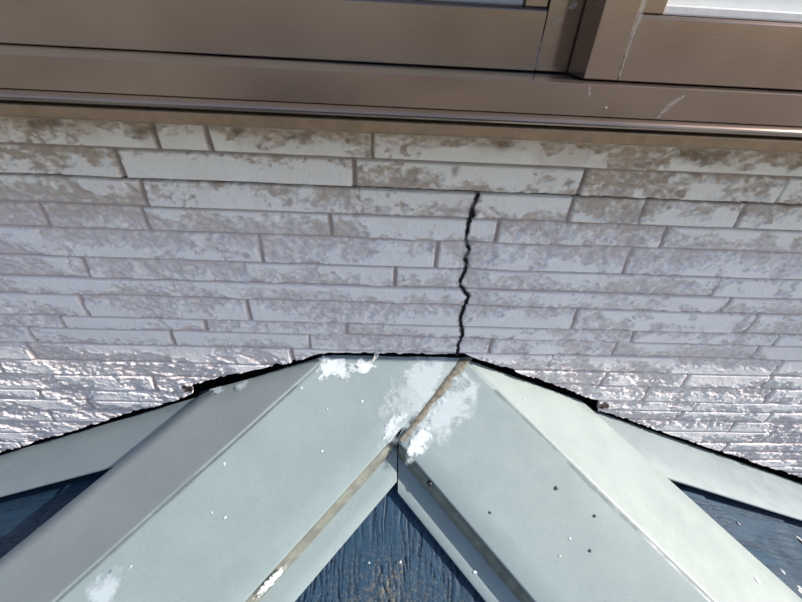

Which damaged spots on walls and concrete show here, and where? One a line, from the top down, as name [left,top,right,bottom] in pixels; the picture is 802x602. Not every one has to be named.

crack [455,193,480,356]